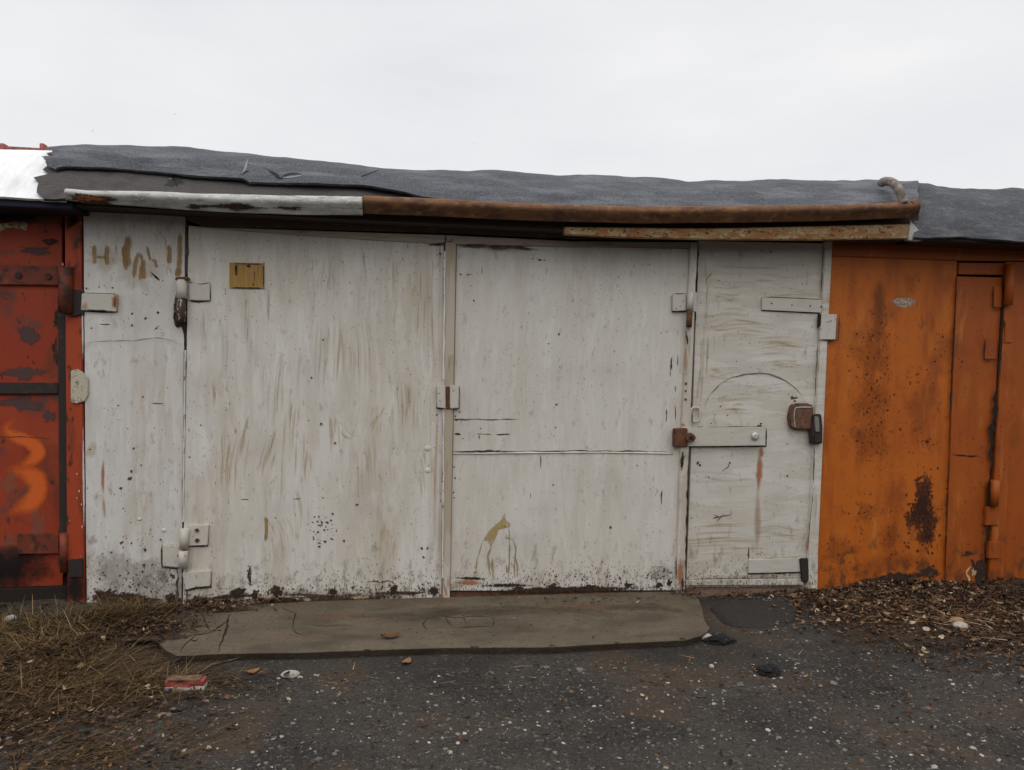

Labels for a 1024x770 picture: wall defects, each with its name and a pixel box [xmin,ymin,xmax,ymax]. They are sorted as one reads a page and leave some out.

rust [821,467,946,567]
rust [188,584,447,608]
rust [457,577,641,593]
rust [655,561,684,591]